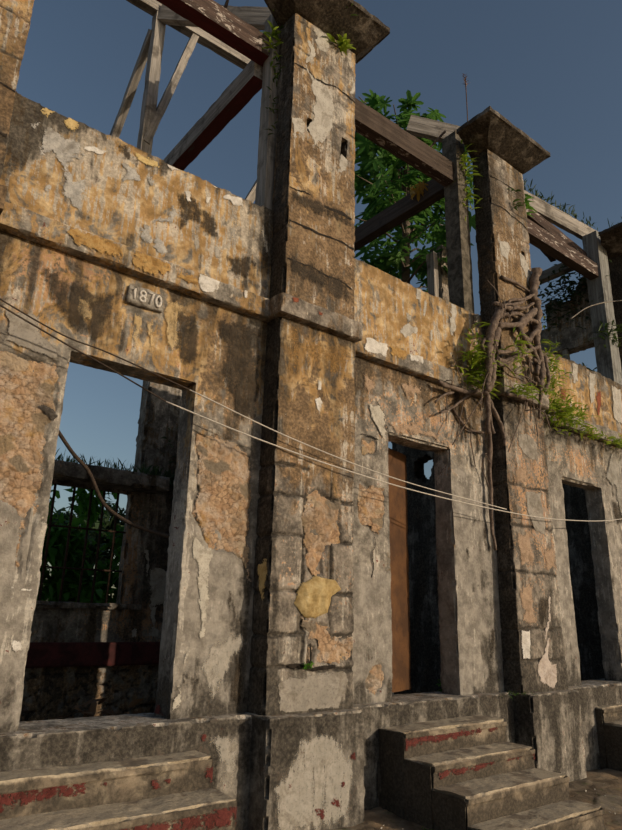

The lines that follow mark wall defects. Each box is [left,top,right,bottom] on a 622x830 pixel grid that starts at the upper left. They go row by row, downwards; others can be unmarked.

peeling [31,108,105,210]
peeling [135,152,179,171]
leakage [178,194,256,278]
peeling [223,194,243,207]
leakage [293,191,351,227]
leakage [43,268,114,340]
leakage [164,302,199,364]
leakage [220,320,261,421]
leakage [291,256,349,302]
flaking render [0,351,59,568]
flaking render [192,433,267,638]
spalling [301,490,341,576]